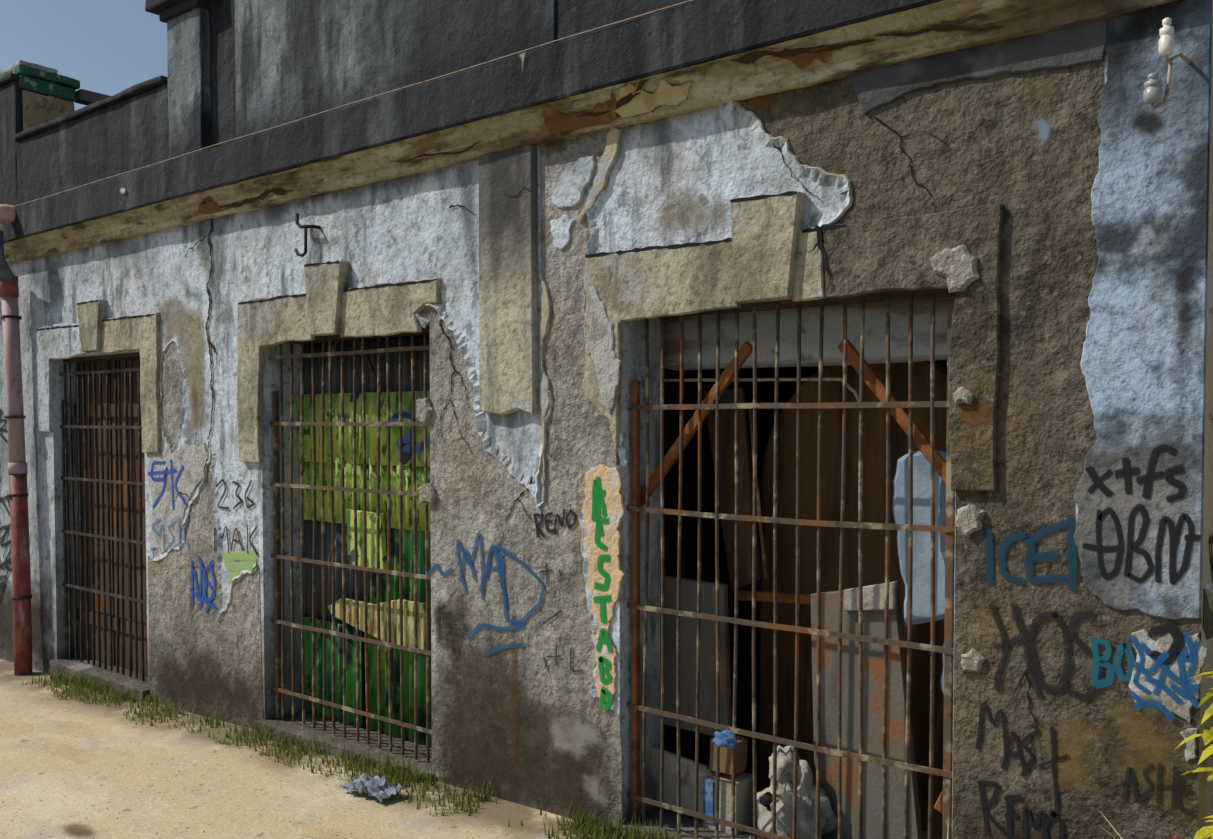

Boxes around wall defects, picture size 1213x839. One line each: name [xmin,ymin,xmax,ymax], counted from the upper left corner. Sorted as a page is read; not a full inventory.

peeling [770,47,832,69]
crack [874,117,949,211]
spalling [146,337,263,729]
crack [174,188,292,534]
crack [439,320,472,452]
spalling [415,80,691,828]
spalling [718,61,1213,839]
damp [435,604,598,826]
corrosion [934,790,943,814]